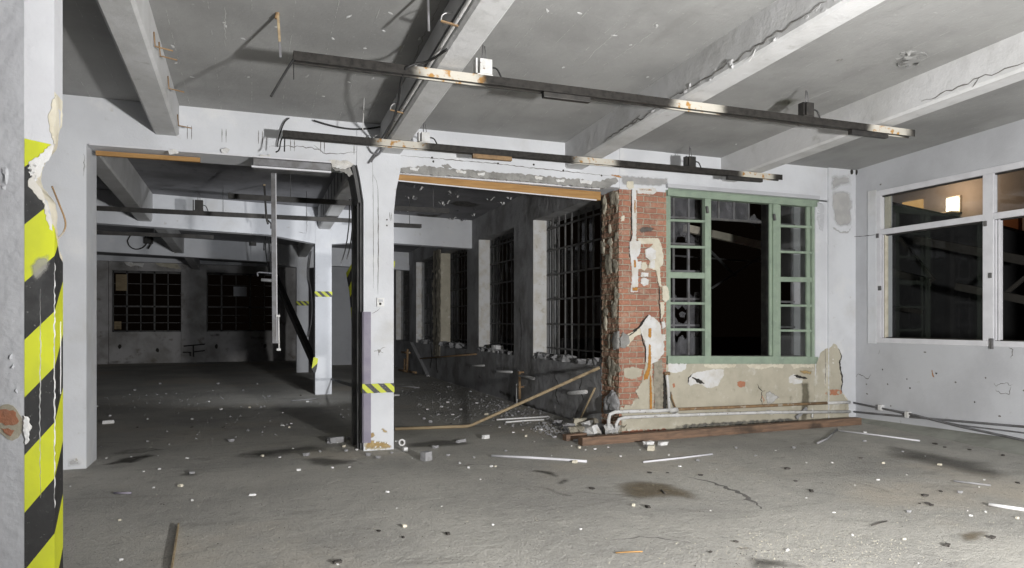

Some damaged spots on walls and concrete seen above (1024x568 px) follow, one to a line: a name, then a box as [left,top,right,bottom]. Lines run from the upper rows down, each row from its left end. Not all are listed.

crack [606,1,827,140]
crack [923,63,1023,101]
flaking render [28,95,60,231]
flaking render [329,160,353,177]
flaking render [400,164,618,221]
flaking render [0,263,61,505]
flaking render [801,344,849,420]
peeling [364,429,390,450]
water stain [626,483,686,496]
crack [690,477,762,509]